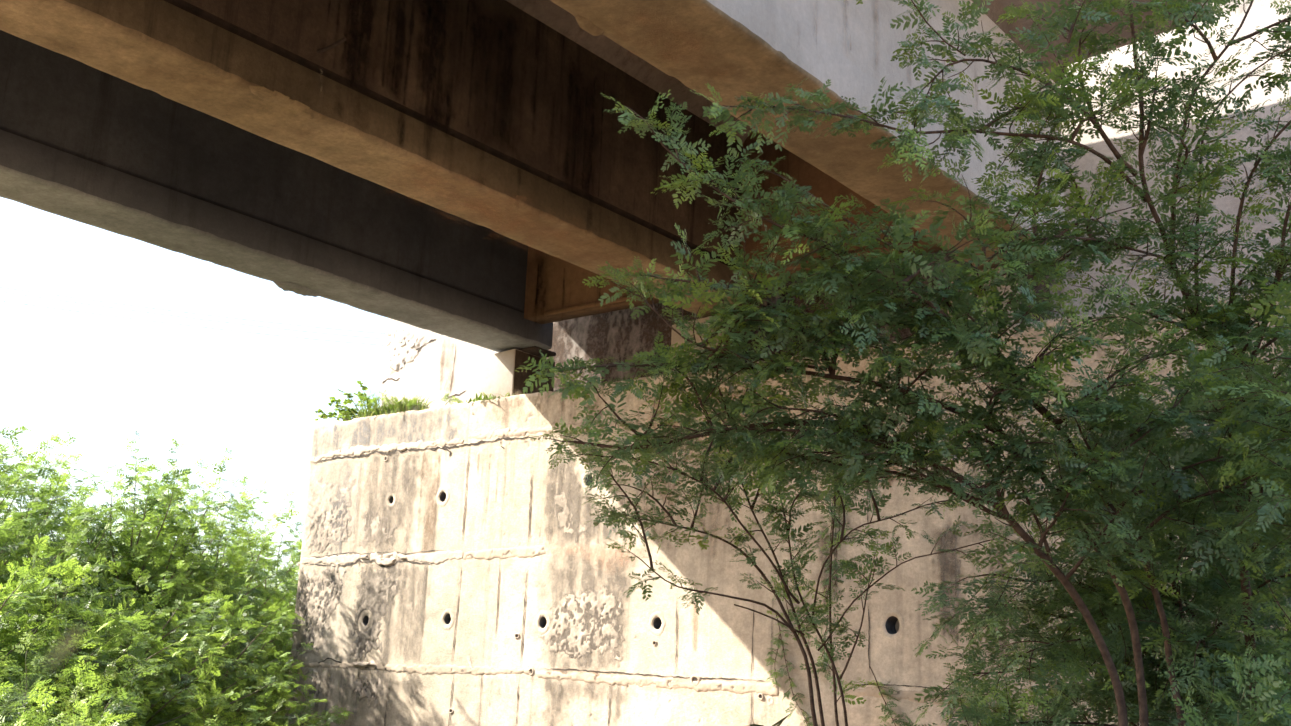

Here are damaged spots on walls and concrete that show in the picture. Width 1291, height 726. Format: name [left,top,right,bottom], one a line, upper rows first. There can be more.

water stain [328,0,517,148]
water stain [333,408,457,672]
water stain [545,454,629,726]